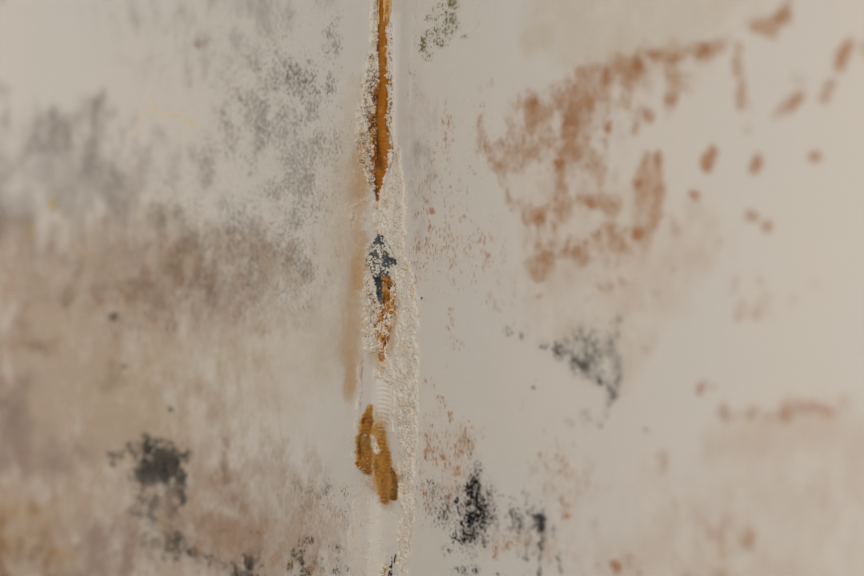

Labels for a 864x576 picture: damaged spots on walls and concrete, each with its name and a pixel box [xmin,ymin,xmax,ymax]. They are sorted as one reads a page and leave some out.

mould [418,0,466,60]
crack [373,0,391,209]
mould [539,317,621,406]
mould [108,431,263,576]
mould [426,440,554,576]
mould [287,535,314,576]
crack [377,554,396,576]